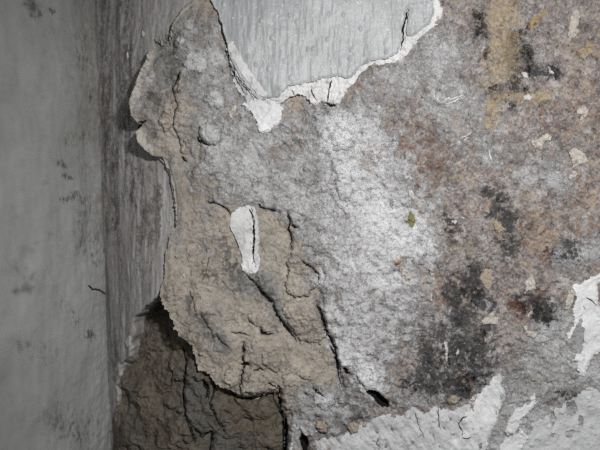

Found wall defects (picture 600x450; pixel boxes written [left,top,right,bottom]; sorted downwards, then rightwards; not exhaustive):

leakage [522,45,562,80]
crack [172,72,187,162]
crack [258,203,297,248]
leakage [119,0,519,450]
crack [190,276,297,422]
crack [316,303,349,385]
leakage [444,289,600,450]
peeling [500,382,600,450]